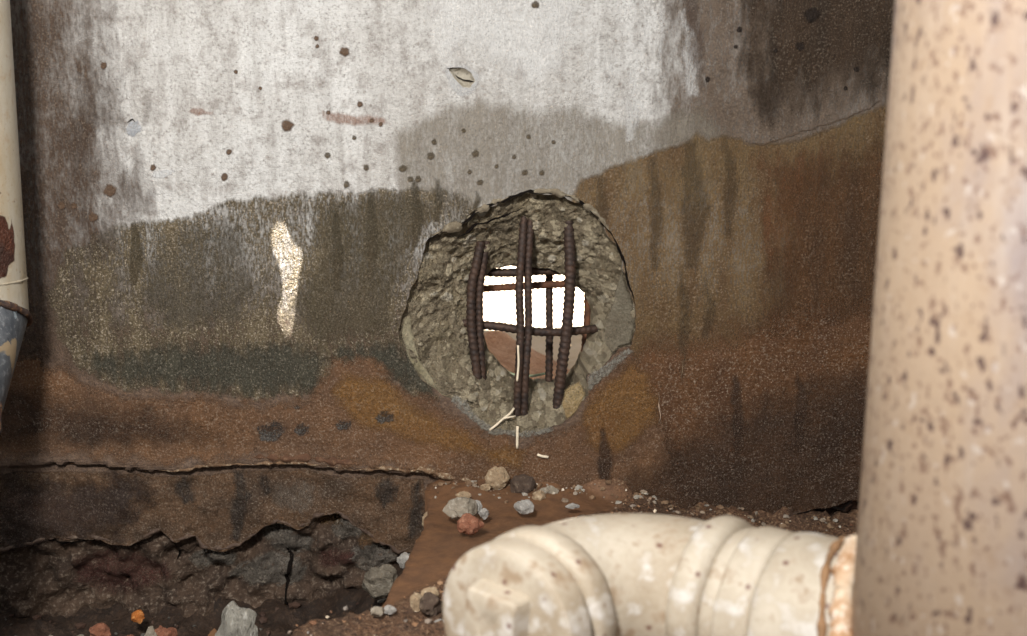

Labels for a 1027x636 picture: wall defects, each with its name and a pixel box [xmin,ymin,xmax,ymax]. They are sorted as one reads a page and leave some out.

rust [326,102,384,140]
water stain [10,0,895,401]
spalling [399,188,636,437]
spalling [0,511,411,618]
water stain [0,469,425,554]